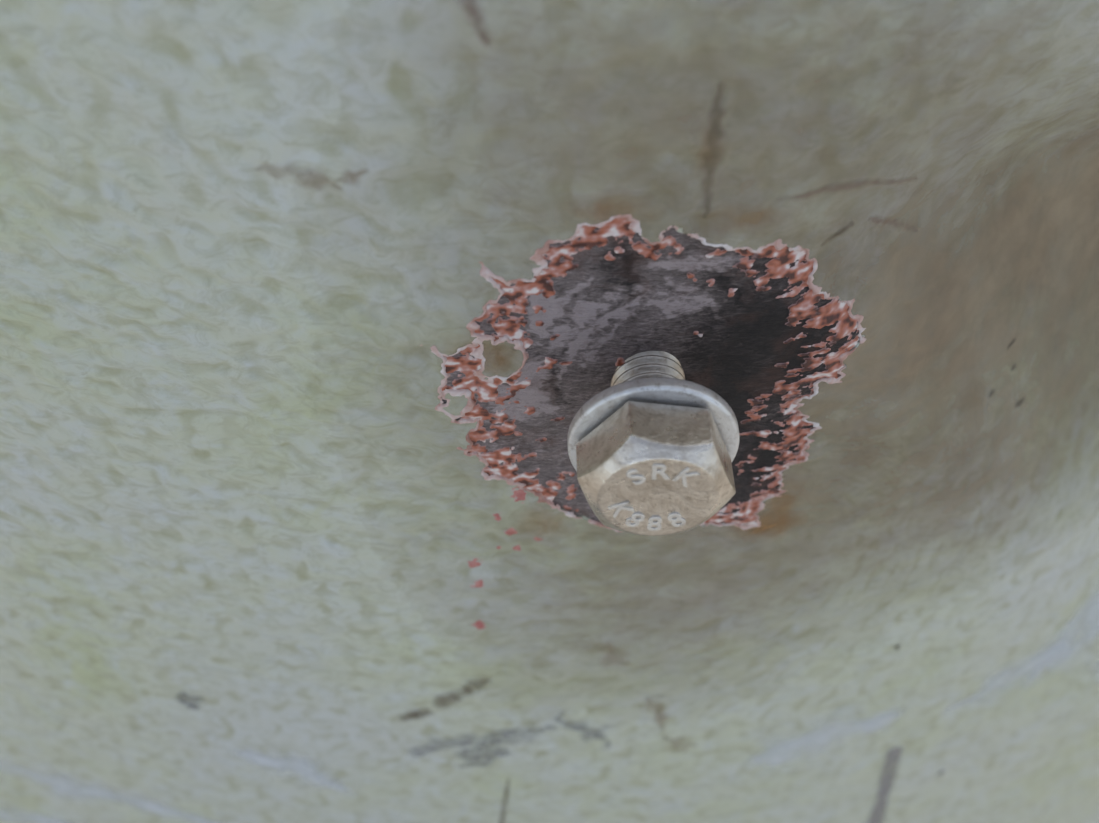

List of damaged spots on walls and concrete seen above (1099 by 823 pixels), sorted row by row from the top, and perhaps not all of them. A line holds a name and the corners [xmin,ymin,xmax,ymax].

peeling [420,214,866,532]
rust [555,58,1099,561]